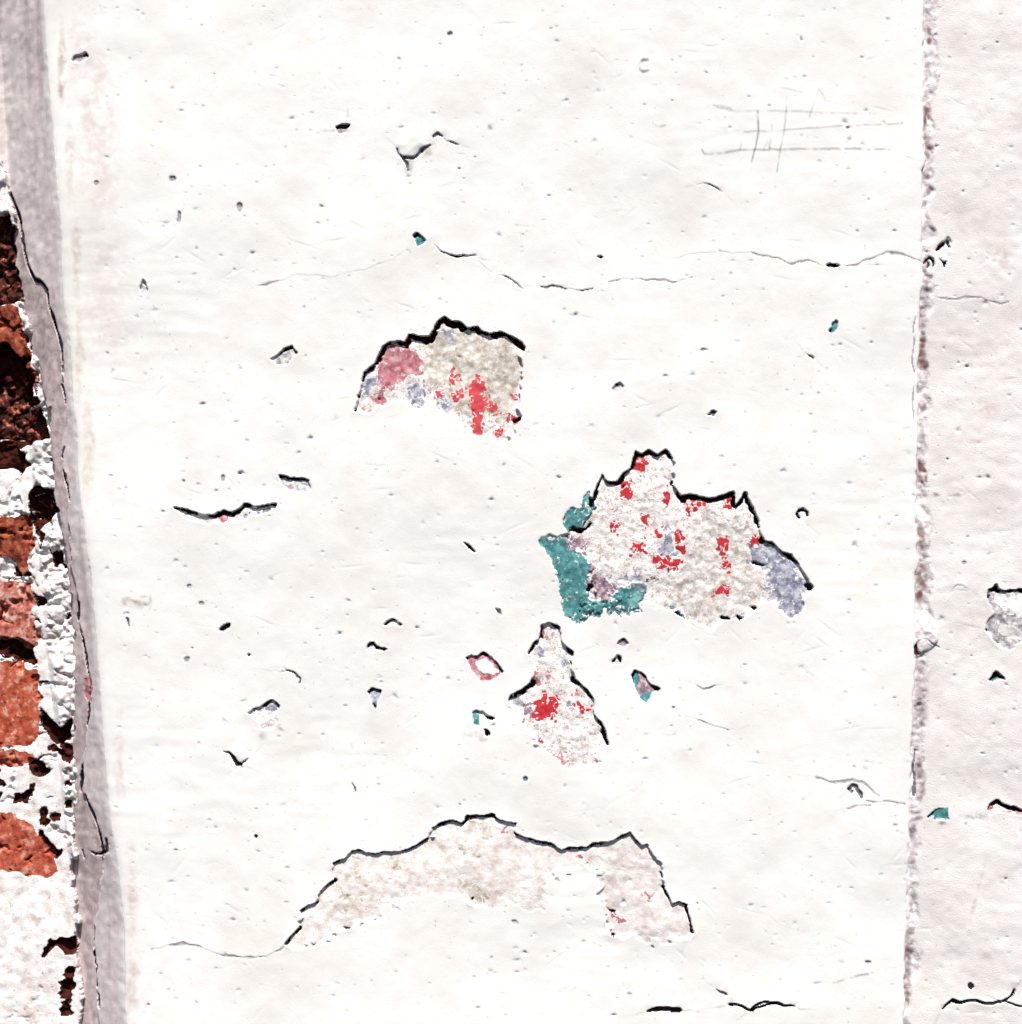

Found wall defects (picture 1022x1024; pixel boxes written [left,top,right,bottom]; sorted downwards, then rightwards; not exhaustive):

crack [751,252,819,265]
crack [846,251,934,268]
crack [503,275,693,292]
spalling [0,343,35,408]
peeling [354,317,525,448]
flaking render [174,503,277,524]
peeling [508,449,813,769]
flaking render [985,584,1022,651]
peeling [466,652,504,681]
peeling [285,813,698,950]
crack [942,989,1022,1010]